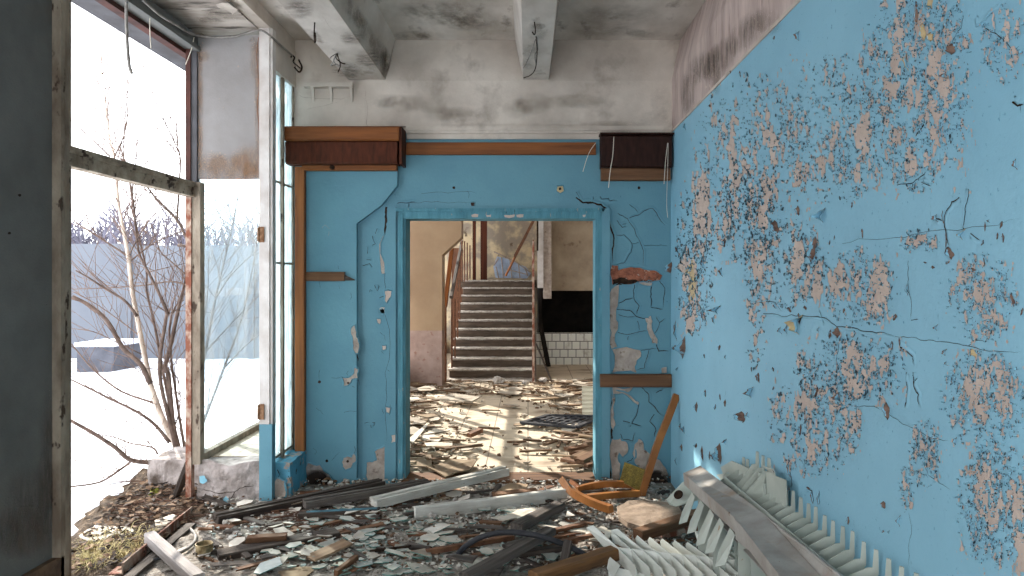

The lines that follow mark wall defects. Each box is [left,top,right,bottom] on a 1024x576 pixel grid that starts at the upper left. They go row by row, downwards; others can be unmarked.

crack [842,189,1013,247]
spalling [341,324,361,387]
spalling [376,289,393,325]
crack [576,191,670,464]
peeling [610,0,1024,576]
crack [750,267,1017,491]
spalling [306,434,397,484]